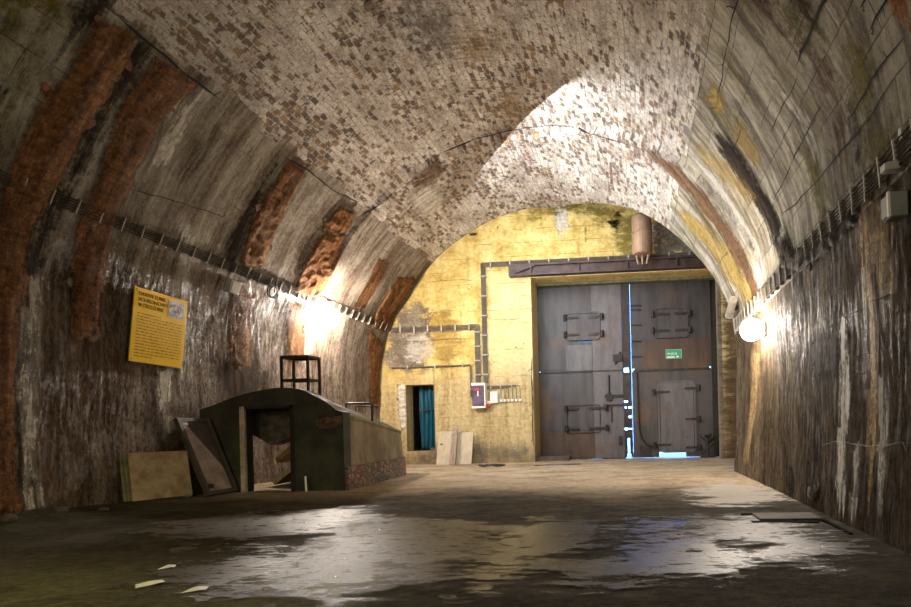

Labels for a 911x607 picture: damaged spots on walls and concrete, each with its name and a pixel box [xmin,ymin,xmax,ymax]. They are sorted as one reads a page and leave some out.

damp [13,36,152,495]
crack [434,122,633,157]
corrosion [645,145,758,303]
damp [692,157,762,266]
damp [715,123,794,251]
damp [752,0,898,199]
crack [771,0,903,216]
damp [824,183,894,290]
damp [157,369,171,409]
damp [791,271,858,512]
efflorescence [878,376,888,465]